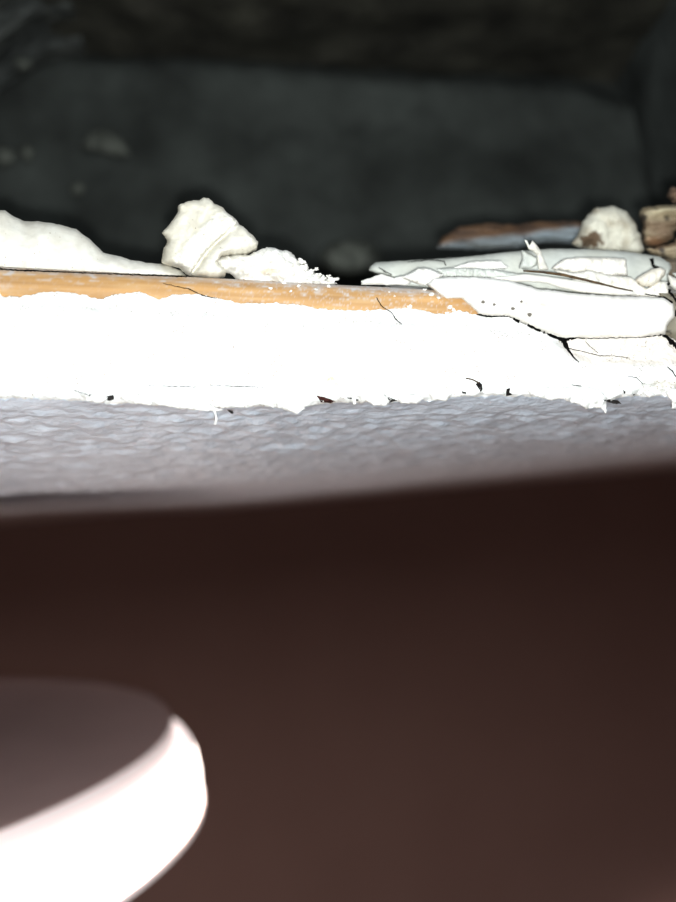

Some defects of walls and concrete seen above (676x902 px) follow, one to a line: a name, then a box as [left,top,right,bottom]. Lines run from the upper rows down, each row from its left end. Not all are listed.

peeling [525,240,548,271]
crack [477,258,676,384]
peeling [74,390,234,425]
peeling [275,395,305,414]
peeling [340,386,466,406]
peeling [526,386,676,413]